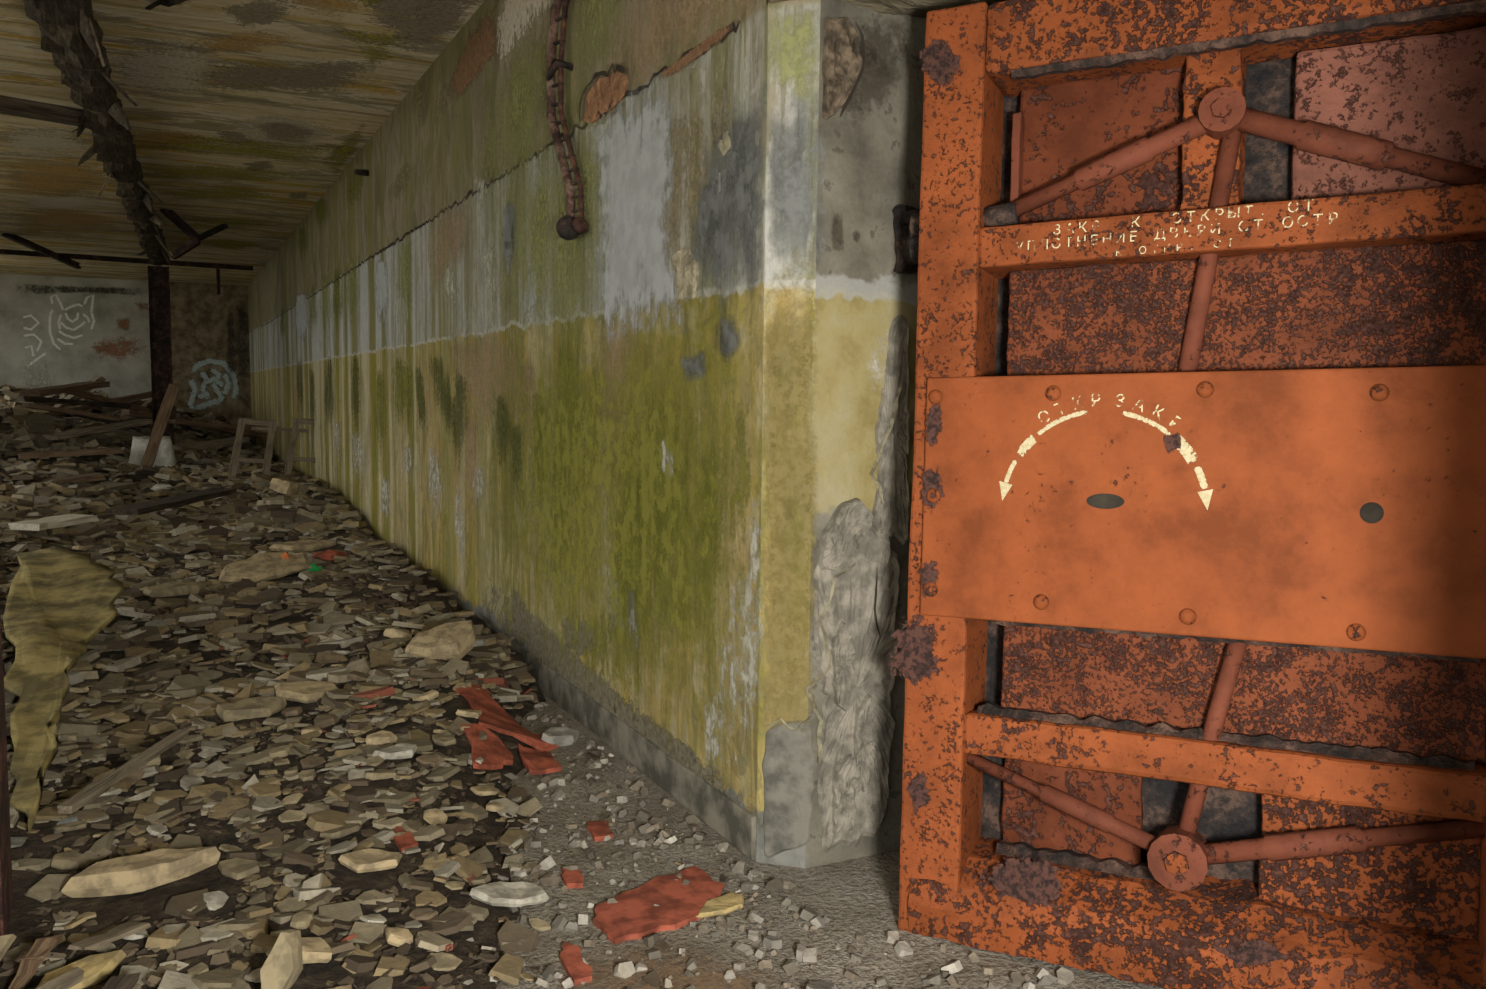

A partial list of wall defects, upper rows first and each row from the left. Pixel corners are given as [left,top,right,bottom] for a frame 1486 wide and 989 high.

peeling [662,26,731,78]
rust [1011,0,1486,80]
spalling [579,63,628,128]
leakage [720,307,738,356]
leakage [662,441,673,476]
leakage [429,448,484,556]
flaking render [806,314,910,853]
leakage [705,504,763,761]
rust [889,560,939,686]
rust [995,621,1480,663]
rust [977,703,1475,770]
rust [979,840,1158,909]